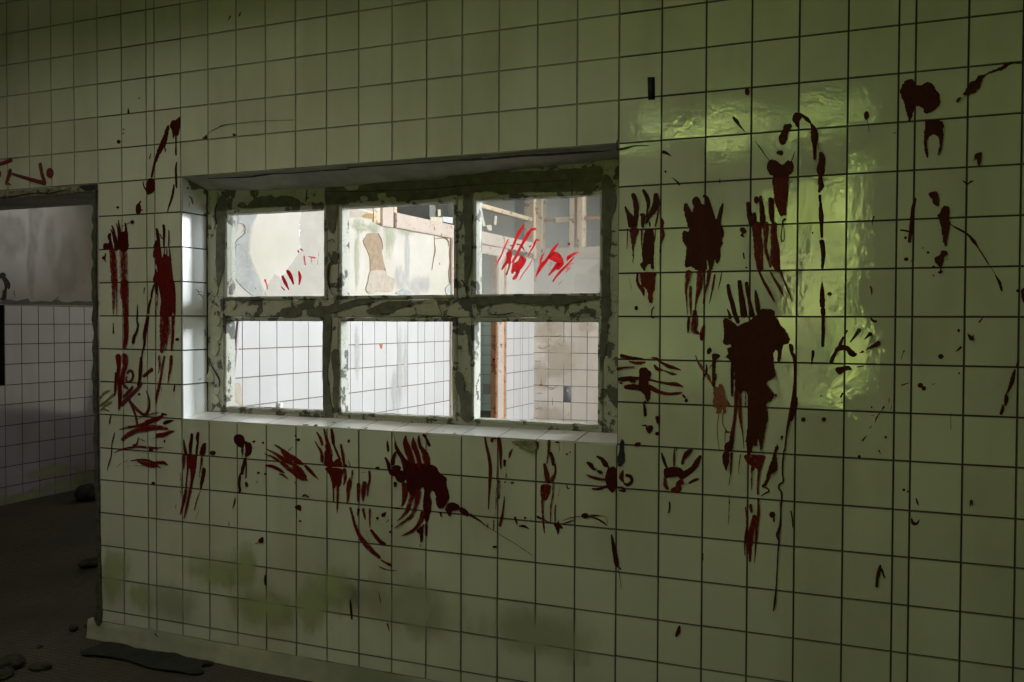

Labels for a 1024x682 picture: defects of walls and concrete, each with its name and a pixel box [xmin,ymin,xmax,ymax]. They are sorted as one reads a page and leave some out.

peeling [207,316,225,413]
peeling [187,179,307,309]
peeling [280,166,616,426]
leakage [332,460,603,665]